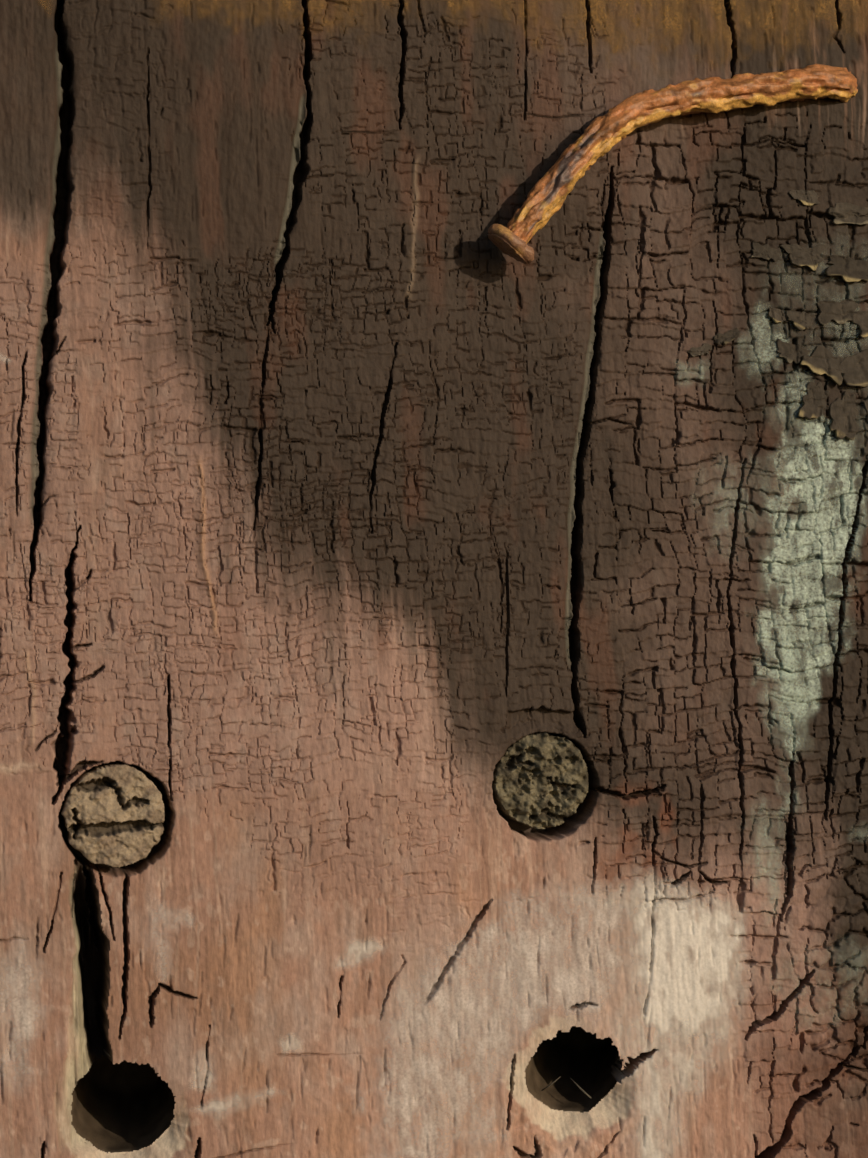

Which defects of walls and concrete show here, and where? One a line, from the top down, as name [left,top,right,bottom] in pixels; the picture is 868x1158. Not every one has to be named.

crack [78,47,196,363]
crack [840,224,868,260]
crack [769,317,865,356]
crack [604,459,620,522]
crack [591,529,631,585]
crack [655,540,665,556]
damp [758,423,864,754]
crack [318,780,374,858]
crack [622,809,630,854]
crack [582,836,605,895]
crack [610,1048,659,1084]
crack [817,1126,839,1158]